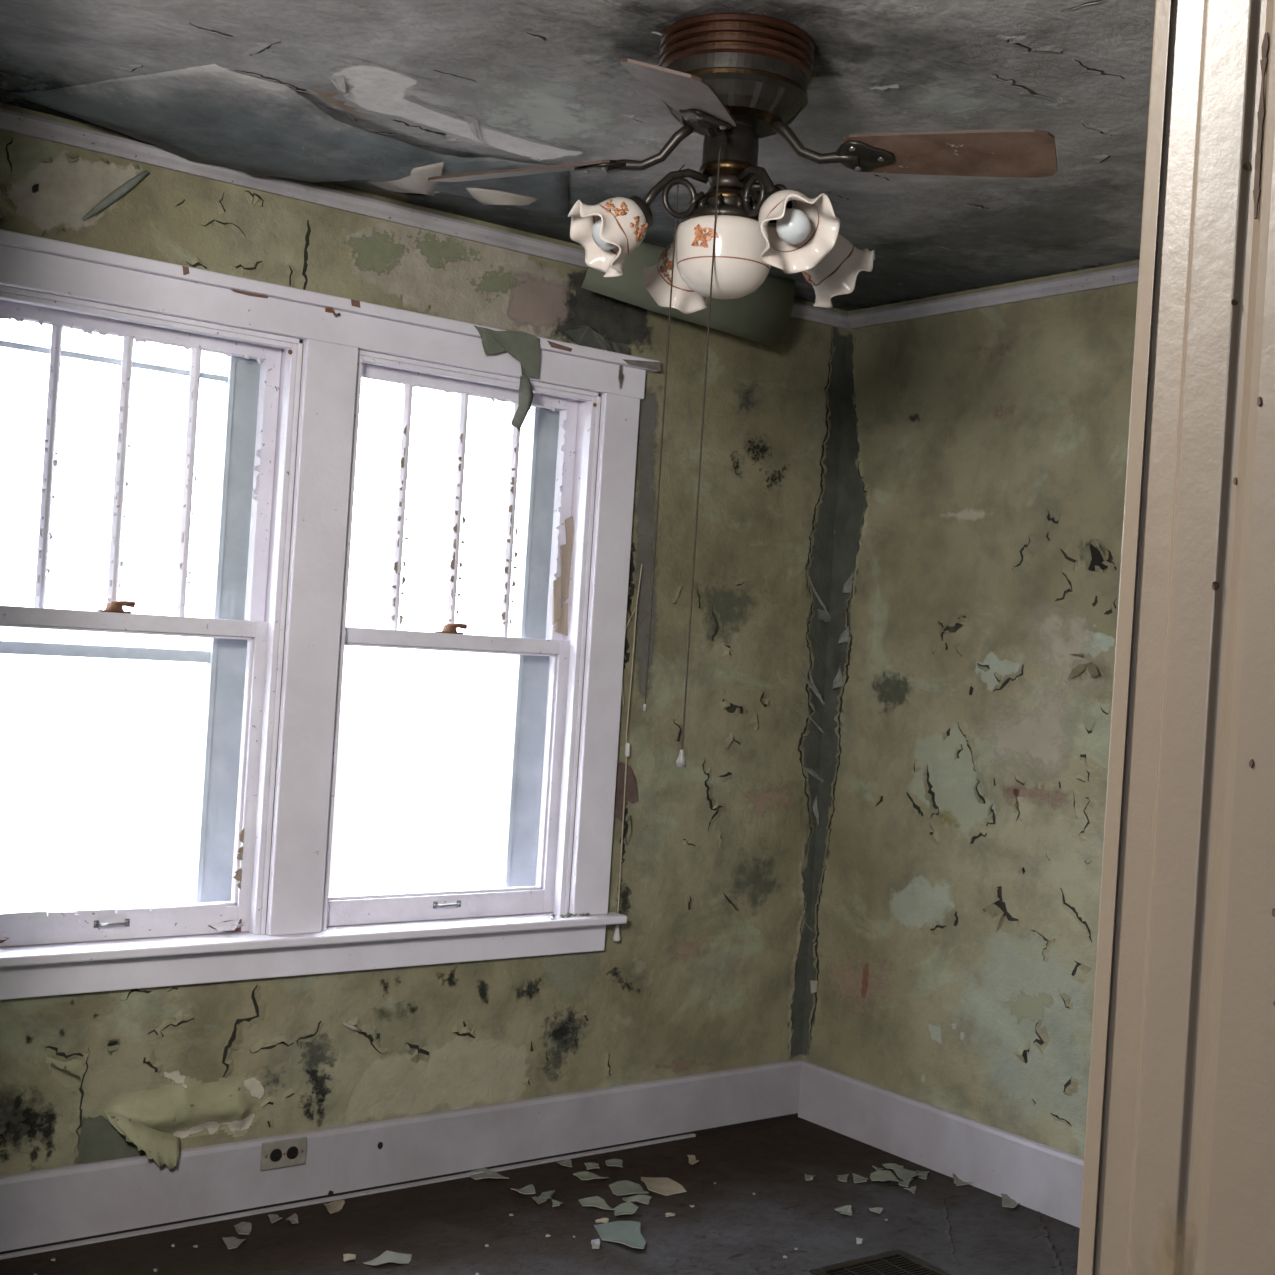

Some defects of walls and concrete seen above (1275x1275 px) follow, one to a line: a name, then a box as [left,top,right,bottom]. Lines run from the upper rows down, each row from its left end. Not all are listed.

leakage [466,81,622,145]
flaking render [0,144,149,239]
crack [174,191,311,290]
leakage [555,271,651,345]
peeling [781,325,872,1063]
peeling [901,712,1009,847]
crack [875,621,1110,864]
crack [930,850,1093,1064]
crack [222,982,476,1078]
peeling [876,862,1098,1158]
mould [0,1093,56,1161]
mould [301,1035,332,1126]